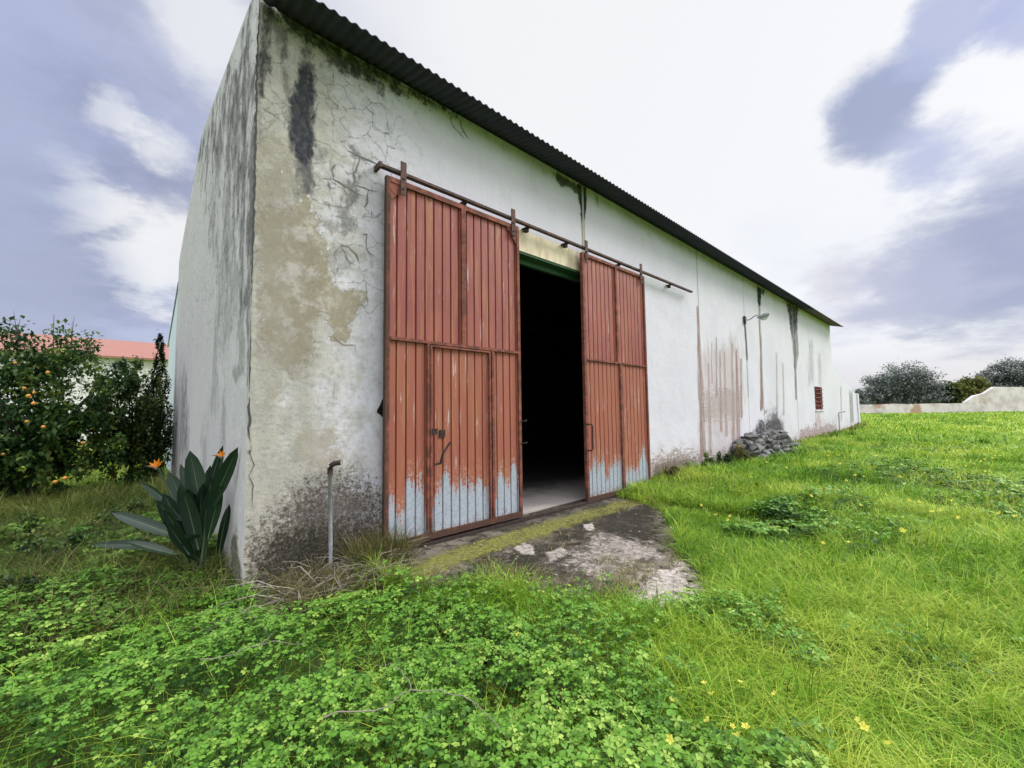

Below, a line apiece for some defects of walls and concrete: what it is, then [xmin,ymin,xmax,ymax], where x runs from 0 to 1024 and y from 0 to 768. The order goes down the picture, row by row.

damp [198,3,458,261]
crack [316,107,397,272]
crack [450,116,469,139]
peeling [253,137,368,378]
damp [233,274,251,381]
damp [791,327,799,399]
damp [244,459,382,590]